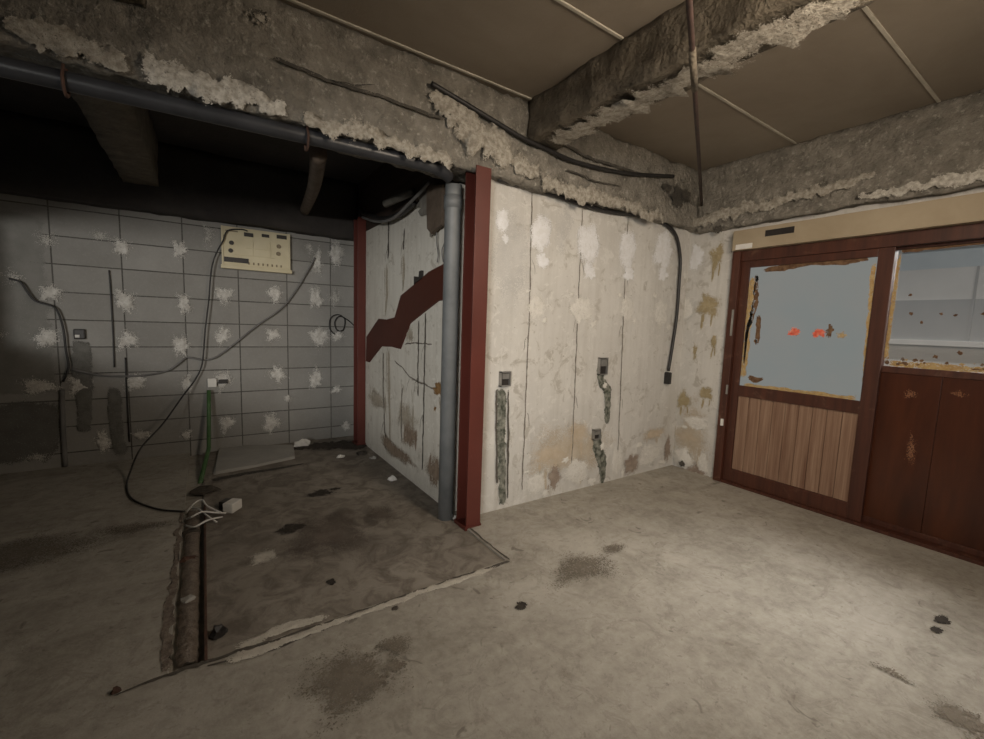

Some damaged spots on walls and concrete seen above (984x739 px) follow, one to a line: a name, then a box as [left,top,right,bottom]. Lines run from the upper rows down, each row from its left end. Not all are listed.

spalling [1,8,287,116]
spalling [551,0,869,146]
spalling [303,111,453,171]
spalling [428,89,664,225]
spalling [662,183,692,210]